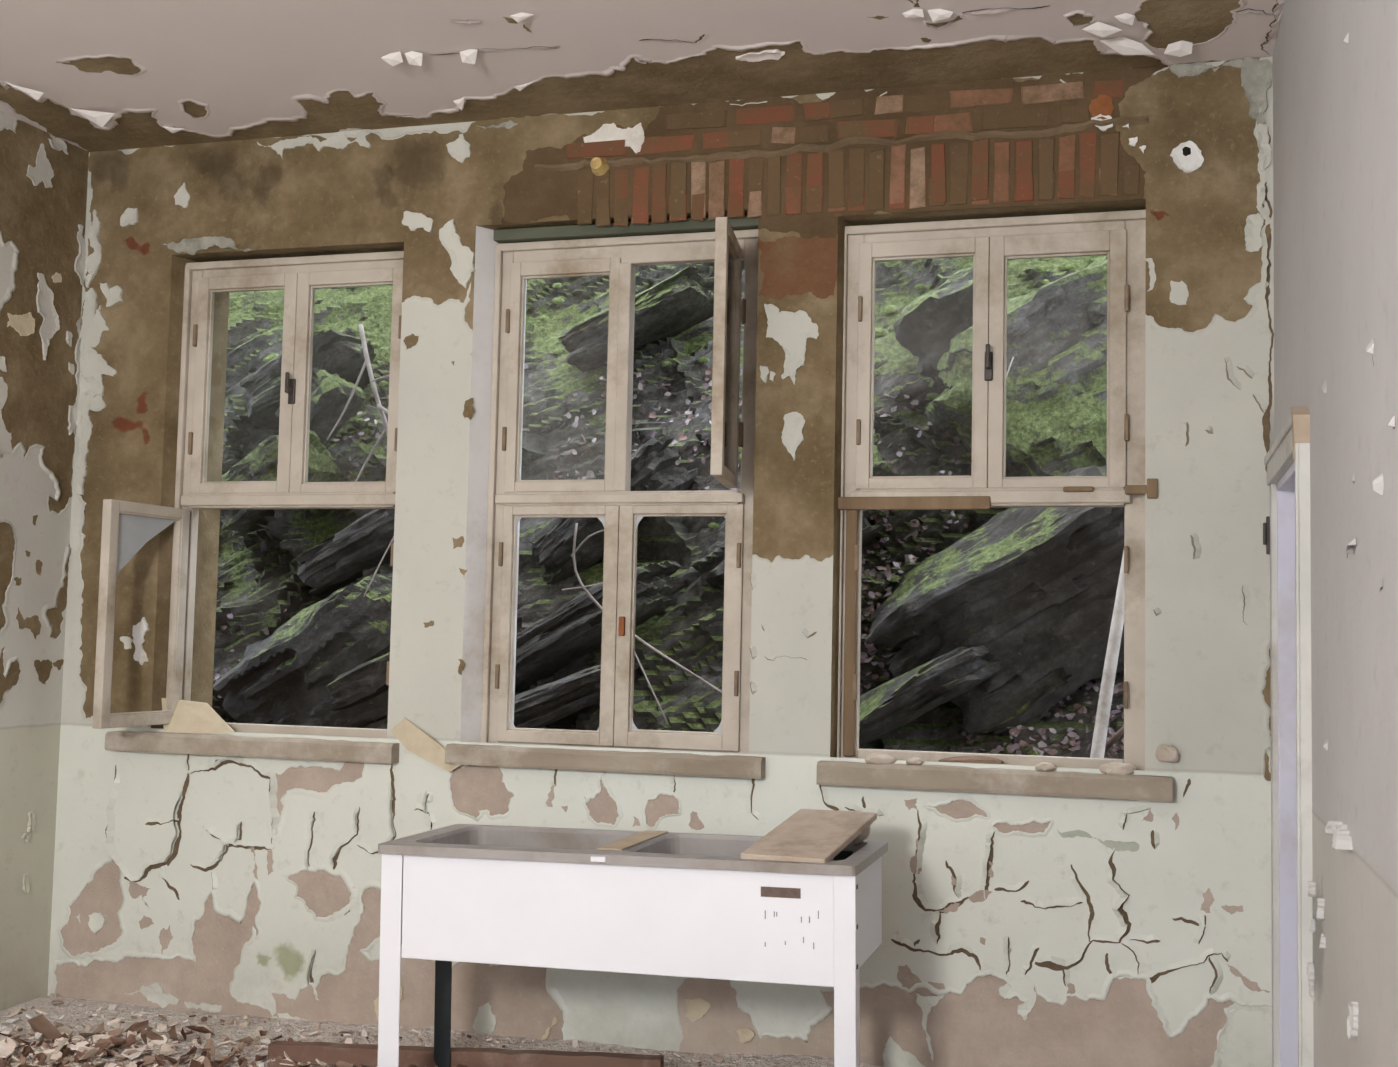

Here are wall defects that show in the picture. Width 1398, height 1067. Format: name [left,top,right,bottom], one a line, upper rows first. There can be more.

peeling [0,0,1273,723]
crack [105,754,437,900]
peeling [448,765,517,822]
peeling [546,771,704,831]
crack [819,785,884,816]
peeling [904,796,1139,852]
peeling [51,761,381,1025]
crack [891,777,1233,995]
crack [306,949,316,987]
peeling [399,945,569,1040]
peeling [672,977,834,1059]
peeling [860,964,1270,1067]